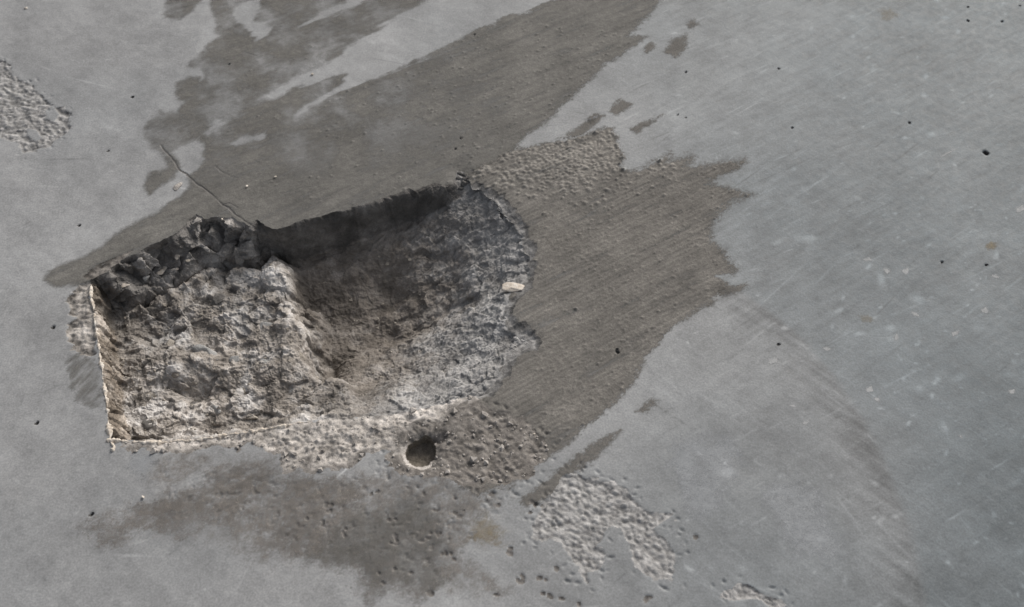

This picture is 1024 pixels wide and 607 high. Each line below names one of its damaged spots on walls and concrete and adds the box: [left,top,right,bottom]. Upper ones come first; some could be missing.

spalling [0,61,73,154]
crack [161,146,252,225]
spalling [65,250,133,356]
spalling [120,169,550,508]
damp [44,0,753,514]
damp [127,455,518,594]
spalling [528,472,677,584]